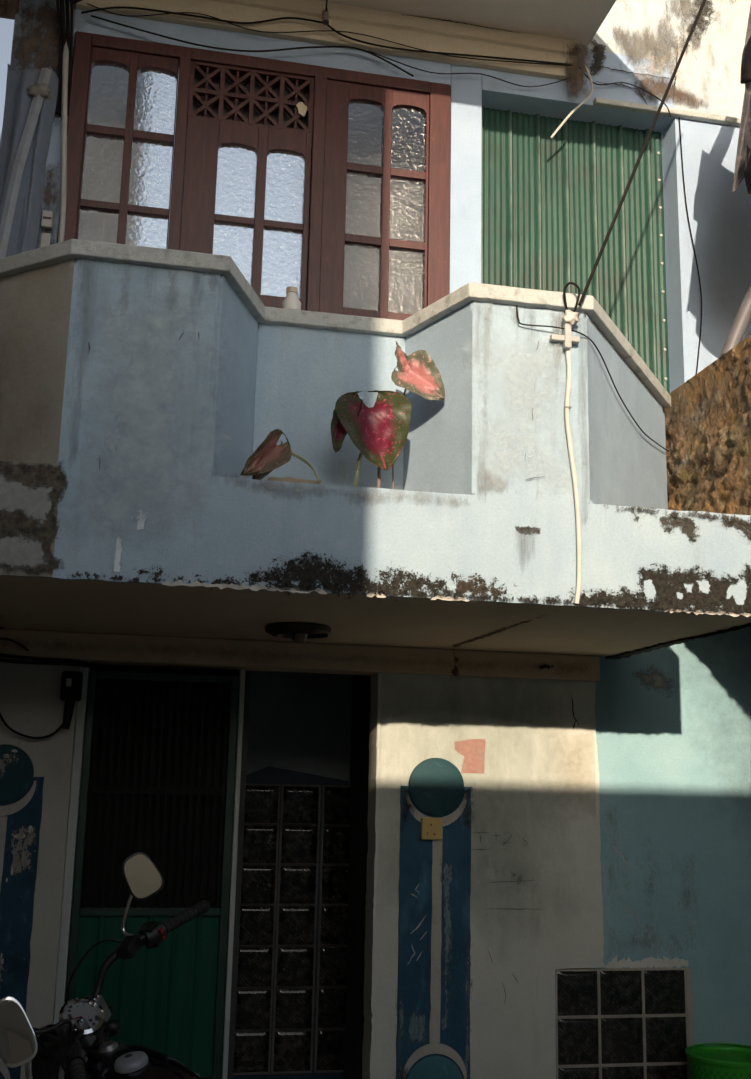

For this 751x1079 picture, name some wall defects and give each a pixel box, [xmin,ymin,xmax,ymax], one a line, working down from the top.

water stain [587,0,717,76]
flaking render [0,474,53,524]
flaking render [0,534,48,571]
water stain [0,461,751,617]